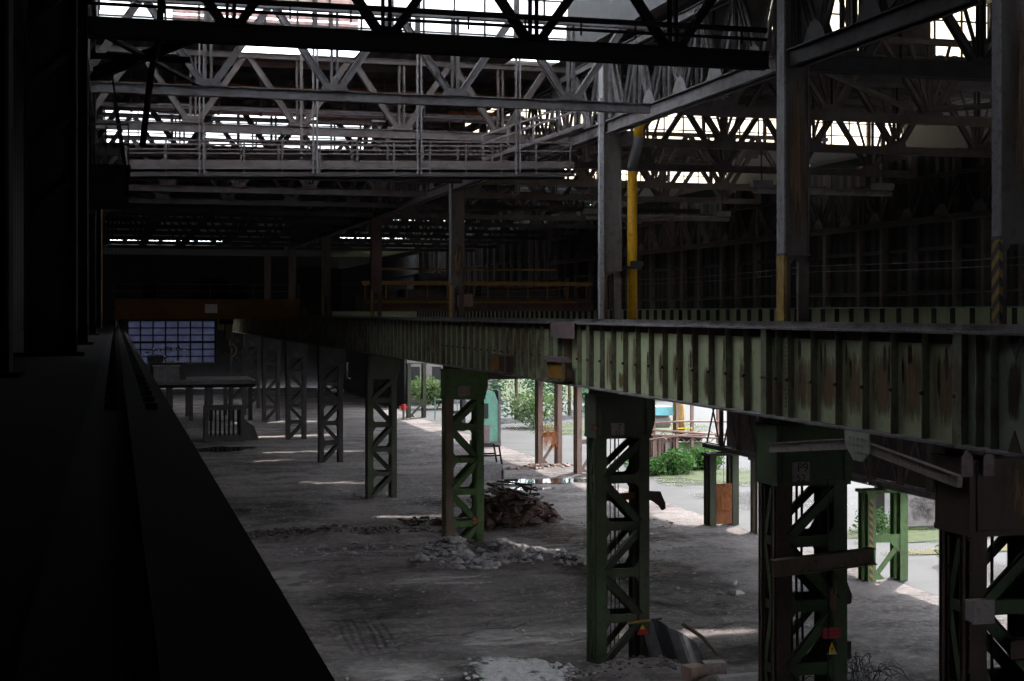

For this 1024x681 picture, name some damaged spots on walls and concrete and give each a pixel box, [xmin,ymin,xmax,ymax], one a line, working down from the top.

corrosion [797,341,835,408]